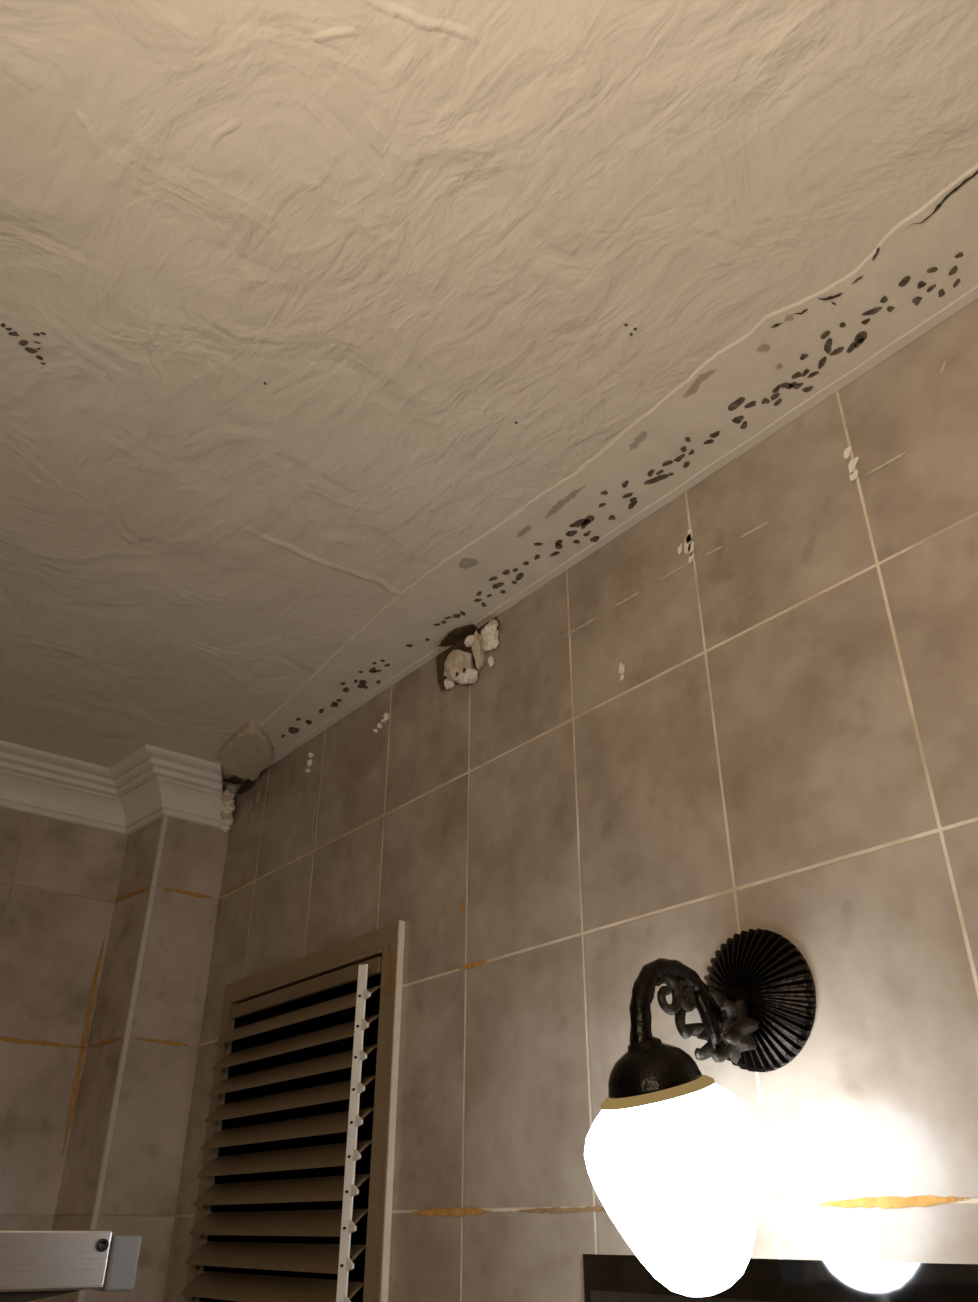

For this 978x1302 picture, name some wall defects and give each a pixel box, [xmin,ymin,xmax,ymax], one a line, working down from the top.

crack [910,170,978,226]
crack [770,247,879,328]
flaking render [218,163,978,833]